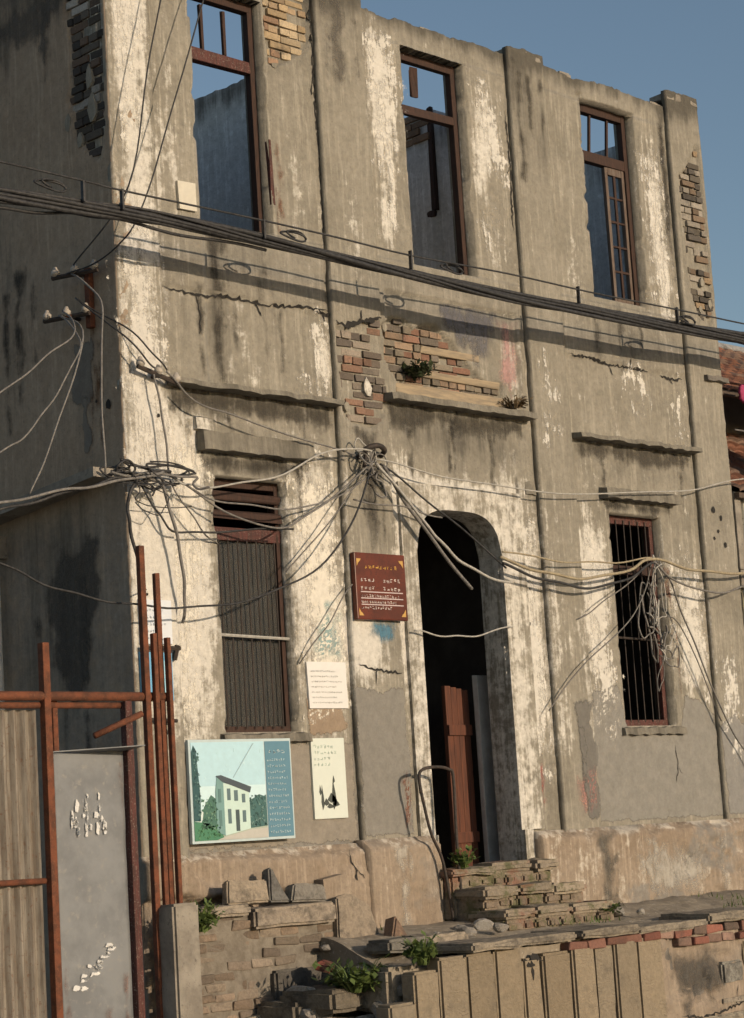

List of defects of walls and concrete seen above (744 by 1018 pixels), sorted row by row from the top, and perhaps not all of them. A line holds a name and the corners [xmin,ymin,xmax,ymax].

spalling [65,0,149,157]
damp [320,0,345,81]
peeling [362,28,430,231]
damp [517,72,543,148]
spalling [679,151,714,321]
crack [164,286,381,334]
spalling [297,307,498,425]
crack [572,353,682,383]
damp [356,427,382,522]
peeling [667,544,744,761]
damp [642,841,702,887]
crack [684,990,744,1018]